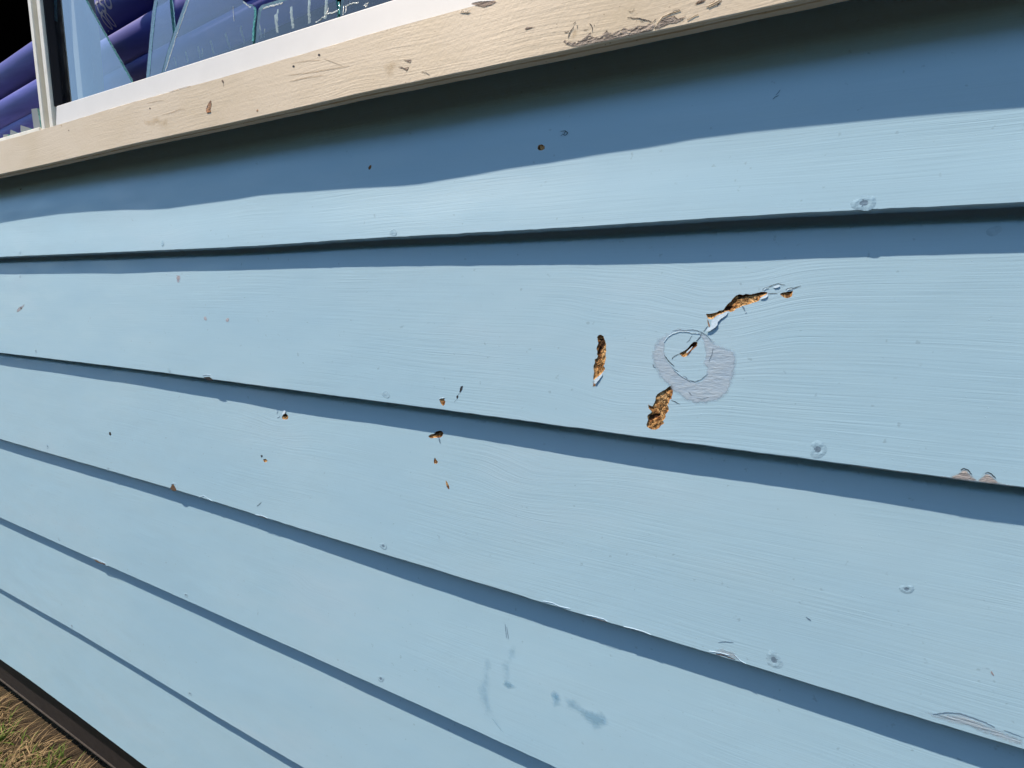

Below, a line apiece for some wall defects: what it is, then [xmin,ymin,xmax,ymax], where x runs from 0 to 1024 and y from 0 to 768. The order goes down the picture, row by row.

peeling [564,0,722,46]
spalling [665,291,793,382]
spalling [593,335,606,386]
spalling [646,386,679,430]
peeling [952,468,998,483]